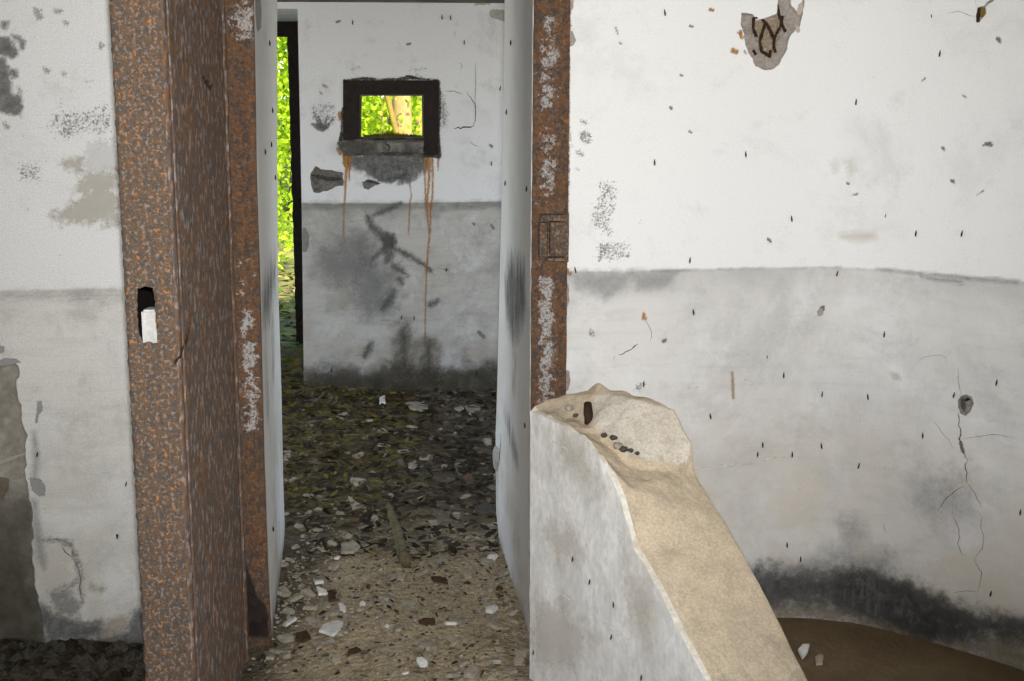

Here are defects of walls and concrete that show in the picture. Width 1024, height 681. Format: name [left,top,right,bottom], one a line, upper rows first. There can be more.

damp [0,22,24,128]
spalling [741,0,805,70]
peeling [53,142,120,224]
corrosion [336,137,351,238]
spalling [310,155,428,193]
damp [322,202,431,312]
corrosion [408,157,440,339]
damp [505,258,525,335]
crack [921,355,1013,593]
crack [43,539,83,601]
damp [752,566,1024,671]